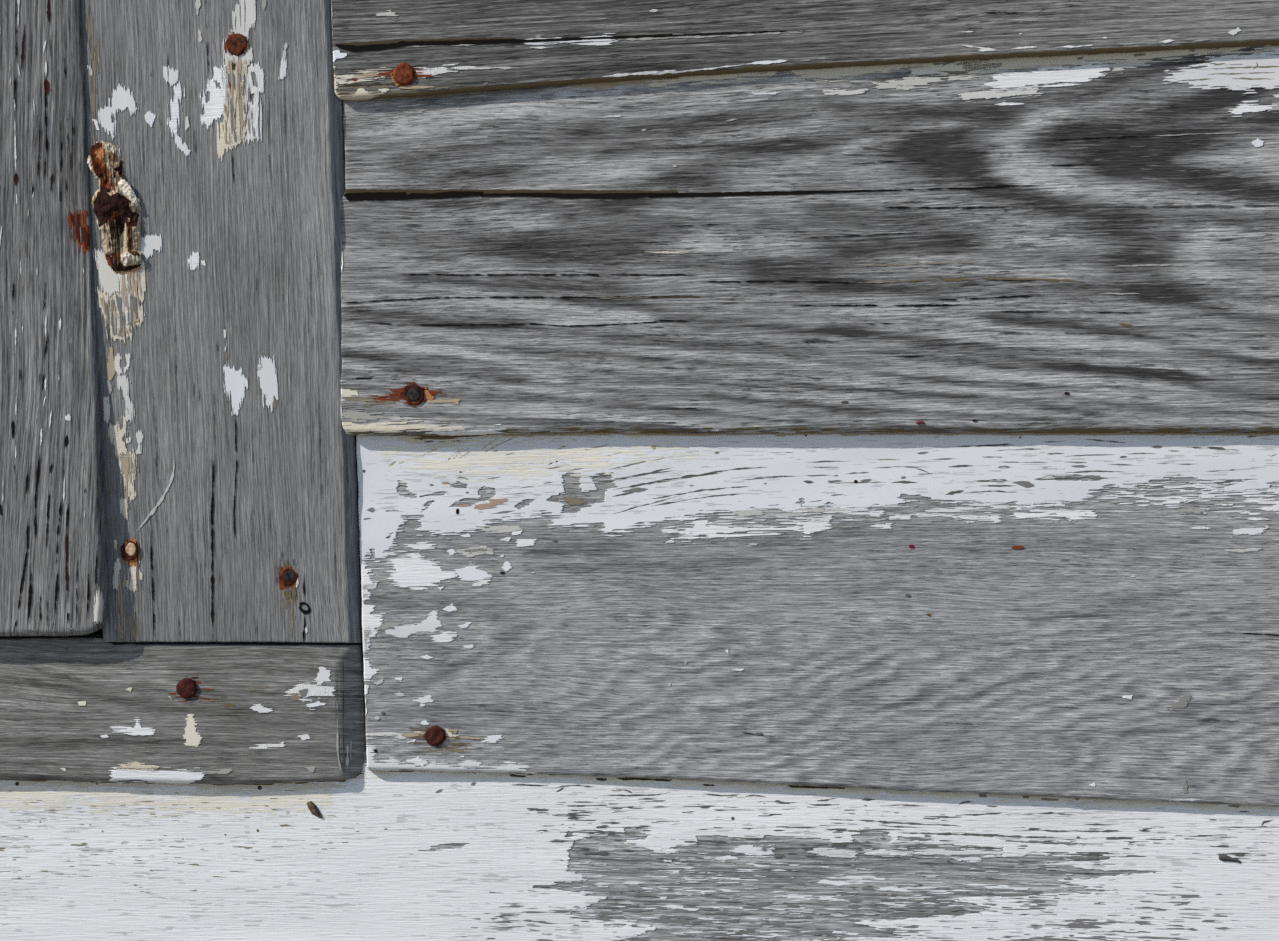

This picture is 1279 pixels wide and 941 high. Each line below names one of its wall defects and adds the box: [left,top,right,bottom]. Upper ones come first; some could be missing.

corrosion [339,67,434,89]
peeling [549,27,1279,117]
corrosion [68,142,142,337]
peeling [83,0,288,520]
corrosion [343,382,460,407]
corrosion [114,537,141,639]
peeling [0,389,1279,941]
corrosion [392,728,483,760]